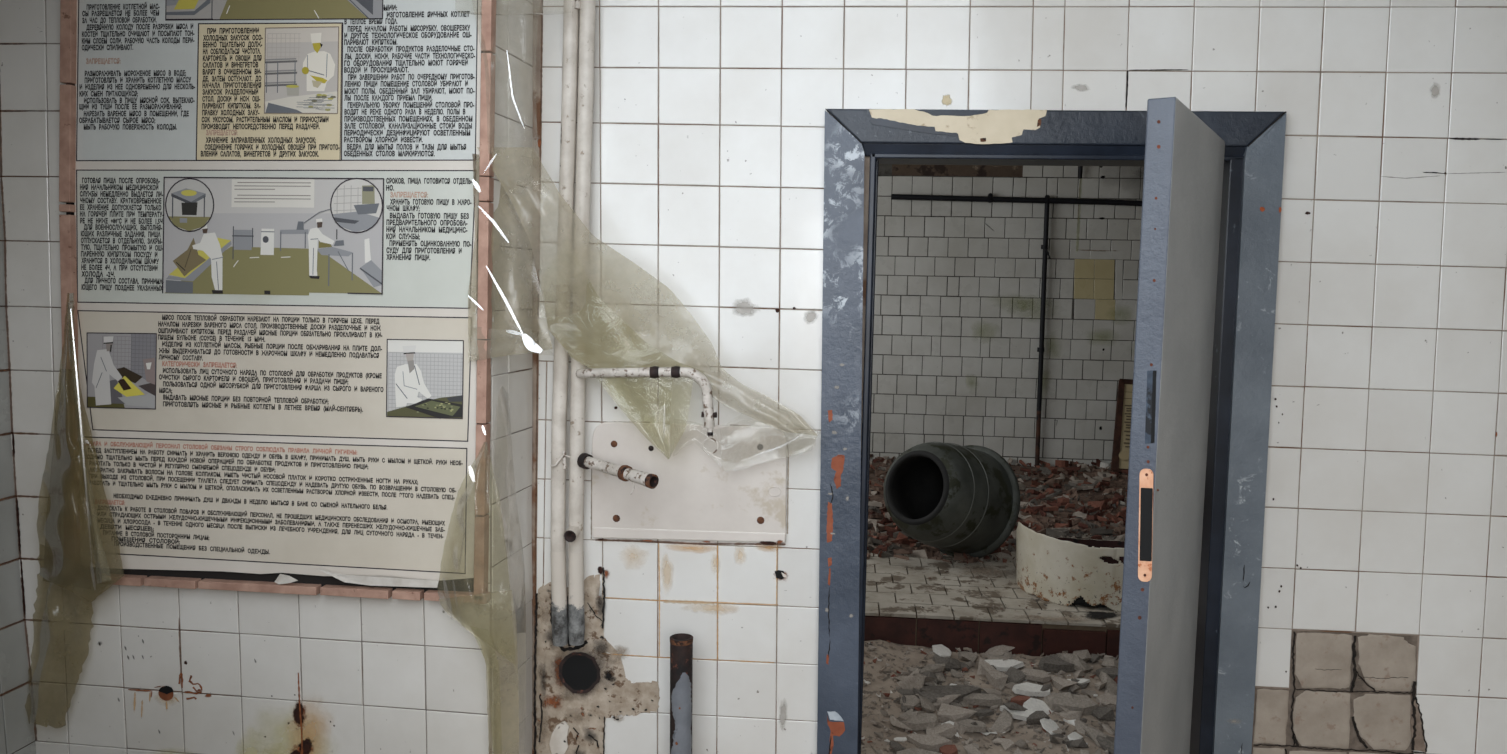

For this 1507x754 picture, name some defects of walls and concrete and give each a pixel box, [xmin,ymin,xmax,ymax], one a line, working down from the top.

peeling [869,109,1047,144]
peeling [826,410,848,665]
rust [118,622,211,714]
rust [288,673,335,754]
spalling [533,566,692,754]
peeling [827,711,845,754]
spalling [1251,630,1428,754]